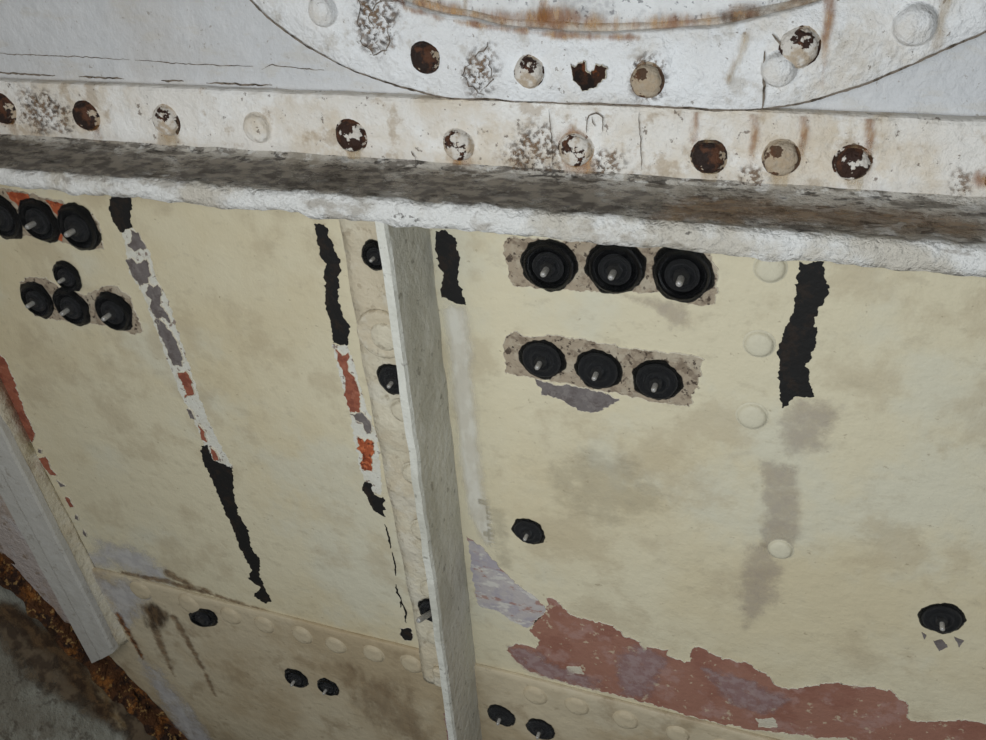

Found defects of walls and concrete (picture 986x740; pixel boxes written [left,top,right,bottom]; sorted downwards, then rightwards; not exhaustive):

corrosion [20,90,73,134]
corrosion [356,0,509,52]
corrosion [465,48,494,92]
corrosion [508,125,560,172]
peeling [0,187,67,218]
peeling [0,354,87,537]
peeling [76,197,271,604]
peeling [314,223,386,517]
corrosion [0,604,157,740]
water stain [116,613,143,659]
water stain [144,604,215,695]
peeling [466,536,986,740]